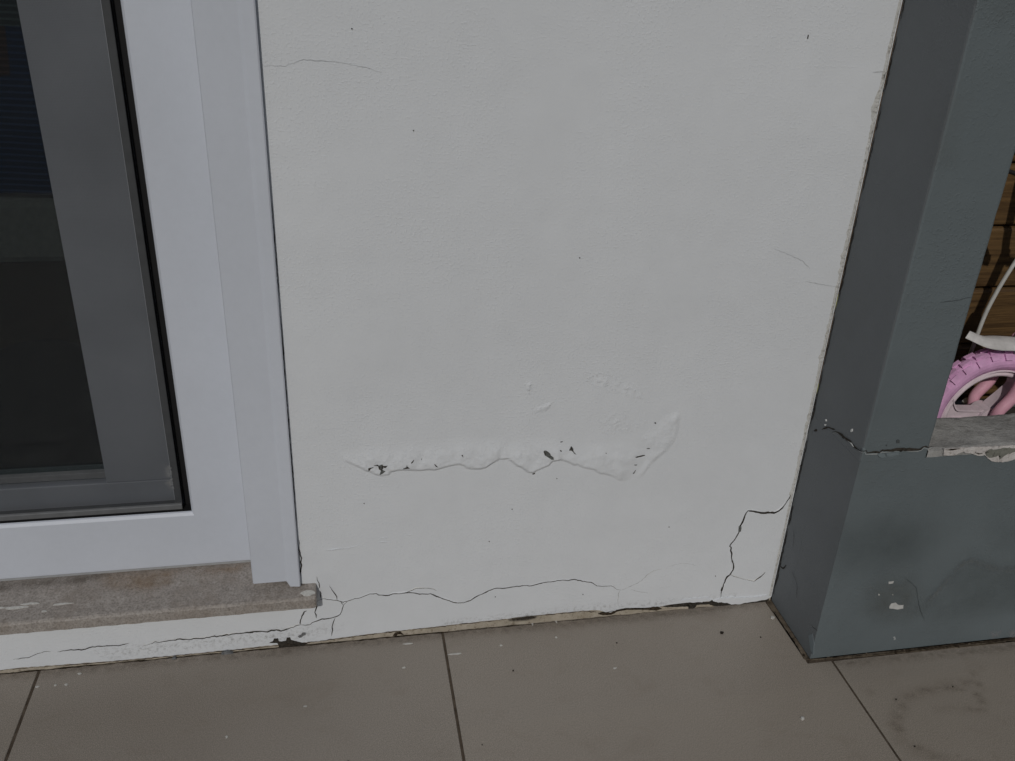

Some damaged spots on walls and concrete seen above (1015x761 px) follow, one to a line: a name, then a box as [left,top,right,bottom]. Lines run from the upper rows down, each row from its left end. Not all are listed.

crack [814,426,932,455]
spalling [943,444,1015,462]
crack [0,325,797,675]